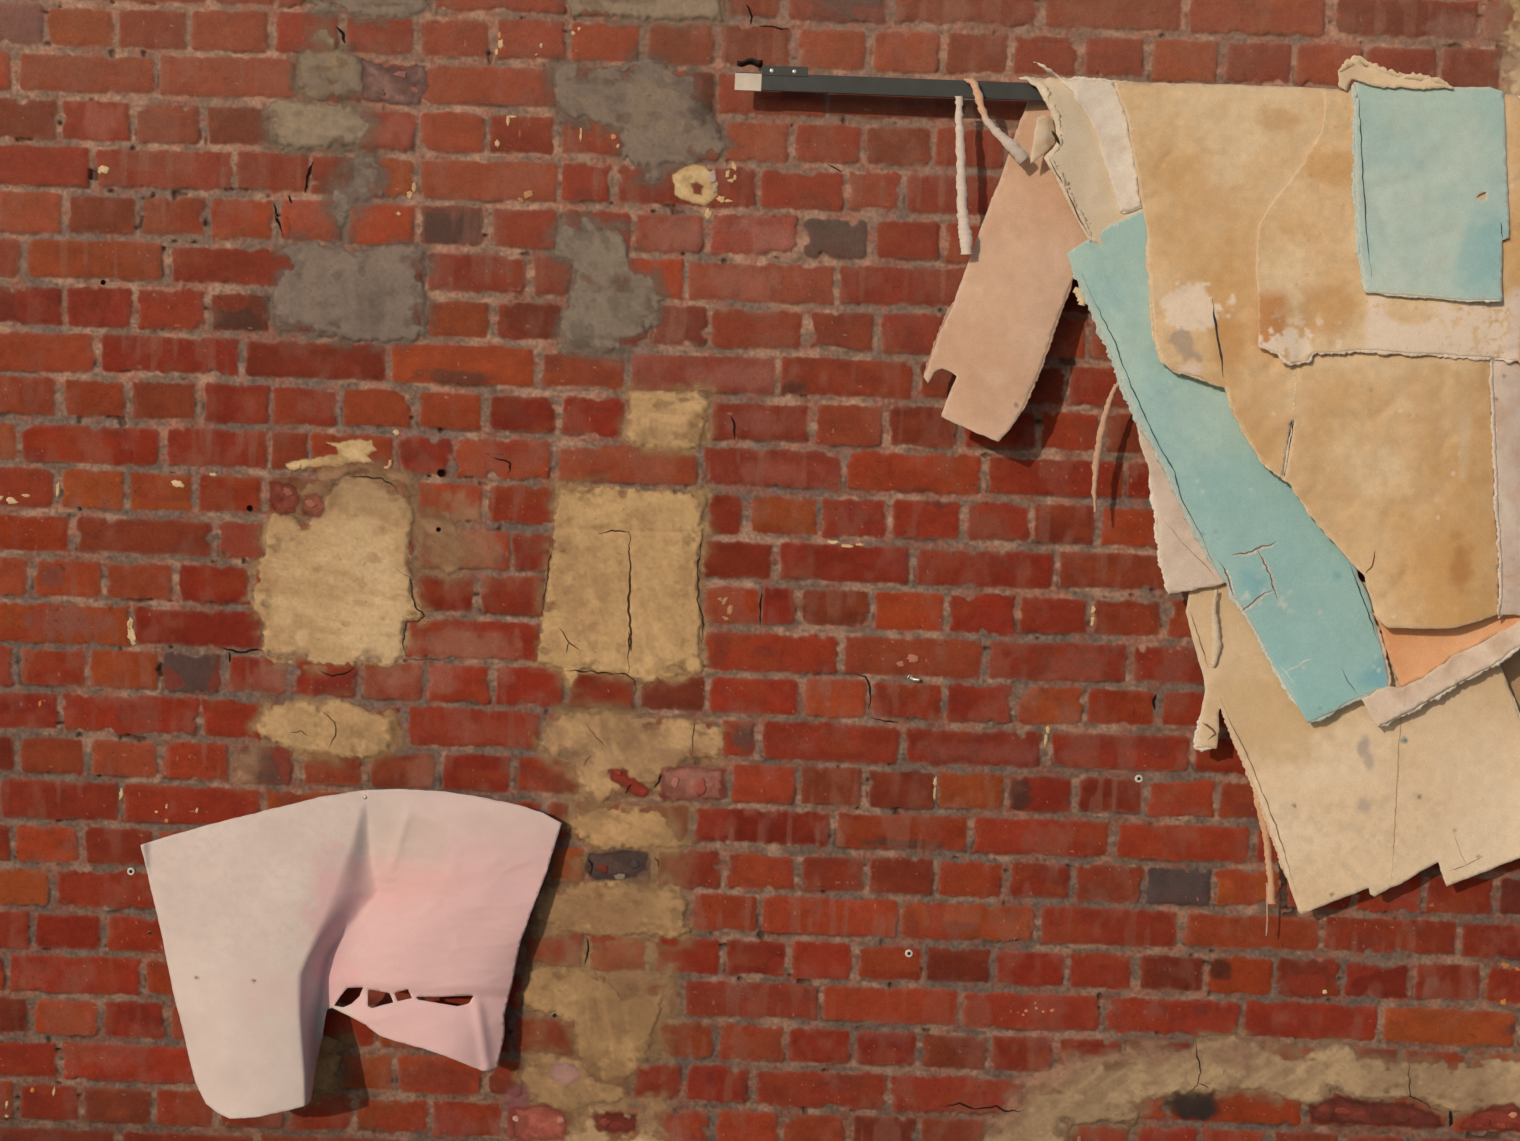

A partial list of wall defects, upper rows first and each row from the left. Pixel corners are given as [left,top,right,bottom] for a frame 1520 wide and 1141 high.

peeling [269,439,392,517]
crack [541,529,636,696]
spalling [608,766,722,801]
spalling [586,850,648,880]
spalling [512,1106,566,1141]
spalling [594,1112,636,1132]
spalling [1309,1098,1441,1127]
spalling [1461,1103,1520,1131]